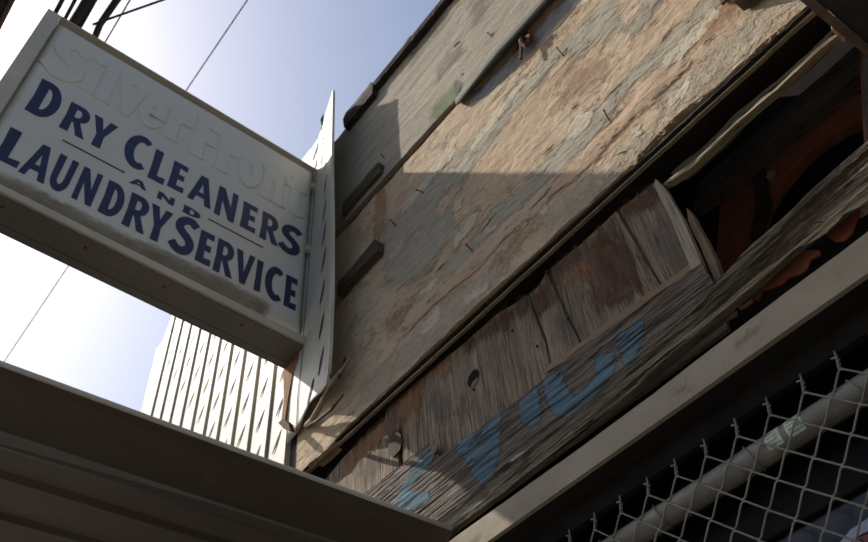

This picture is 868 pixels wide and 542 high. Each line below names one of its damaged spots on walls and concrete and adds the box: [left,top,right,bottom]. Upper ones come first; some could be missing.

peeling [358,0,807,406]